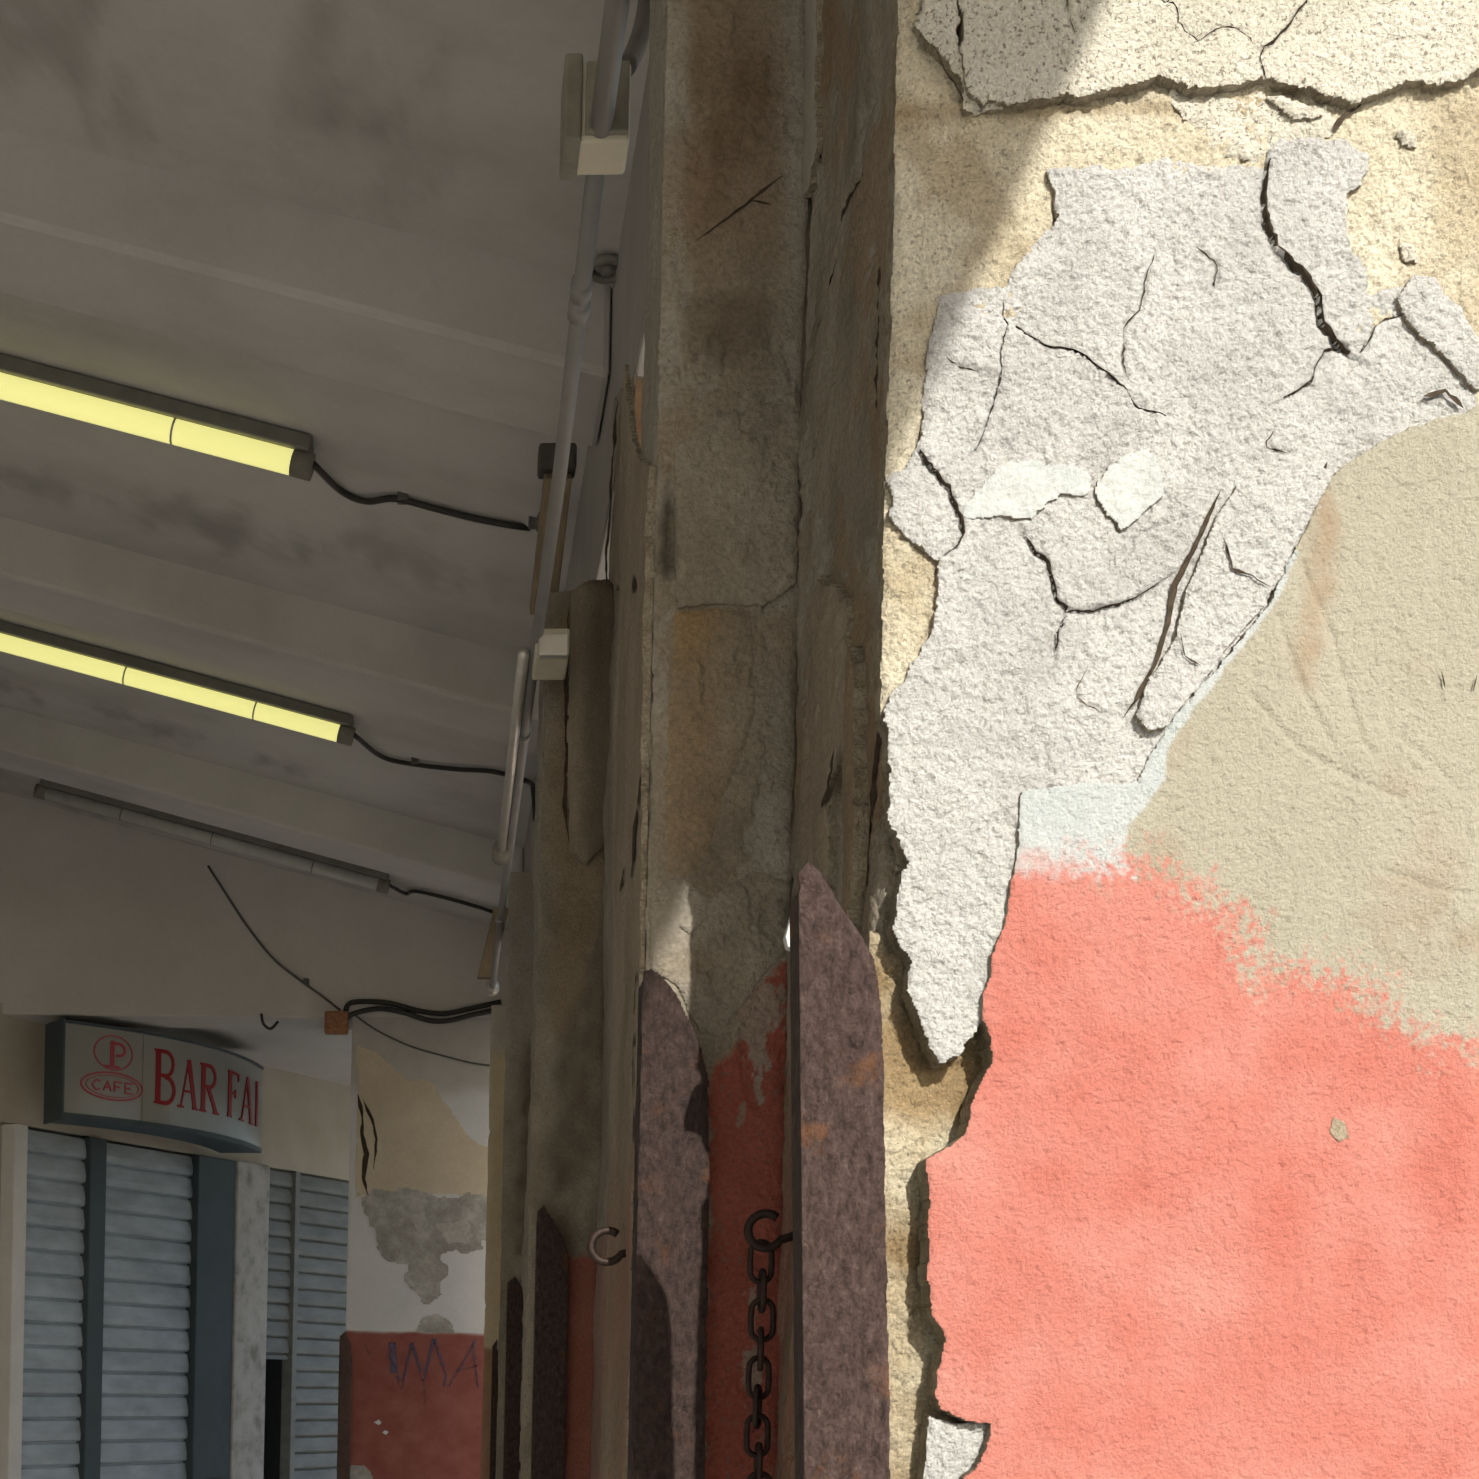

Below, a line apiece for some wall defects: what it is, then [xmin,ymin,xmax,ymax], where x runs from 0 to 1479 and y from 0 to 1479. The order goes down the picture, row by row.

crack [1161,0,1308,78]
crack [693,175,783,243]
crack [946,256,1166,451]
crack [1197,247,1218,288]
crack [1261,159,1402,398]
crack [1423,389,1463,408]
crack [919,449,965,555]
crack [1025,490,1271,716]
flaking render [864,0,1479,1479]
peeling [600,365,800,1479]
crack [358,1095,378,1196]
peeling [355,1046,488,1333]